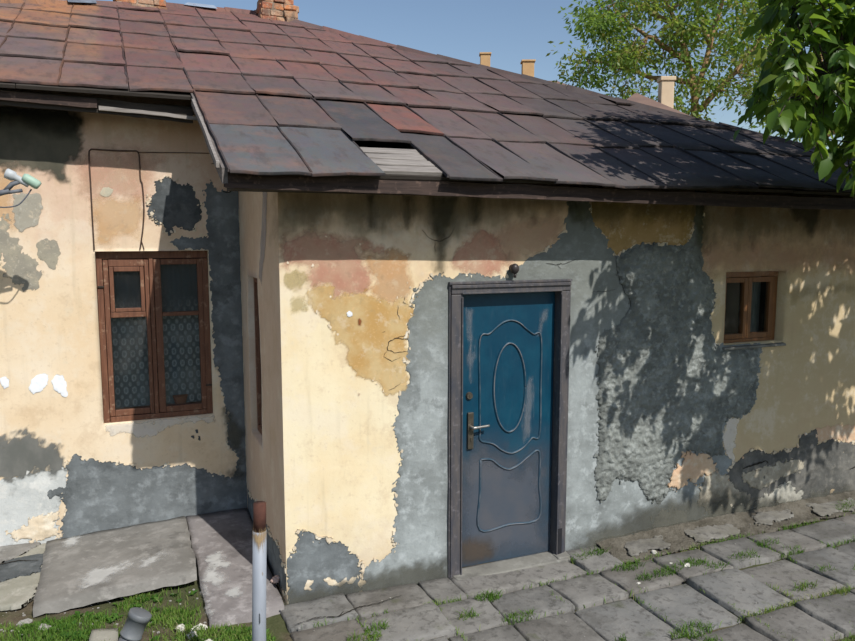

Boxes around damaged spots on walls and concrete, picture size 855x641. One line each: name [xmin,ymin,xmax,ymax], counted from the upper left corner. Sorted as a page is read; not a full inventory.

water stain [0,105,82,182]
water stain [431,197,490,269]
spalling [0,175,257,546]
crack [384,299,408,361]
spalling [266,201,855,605]